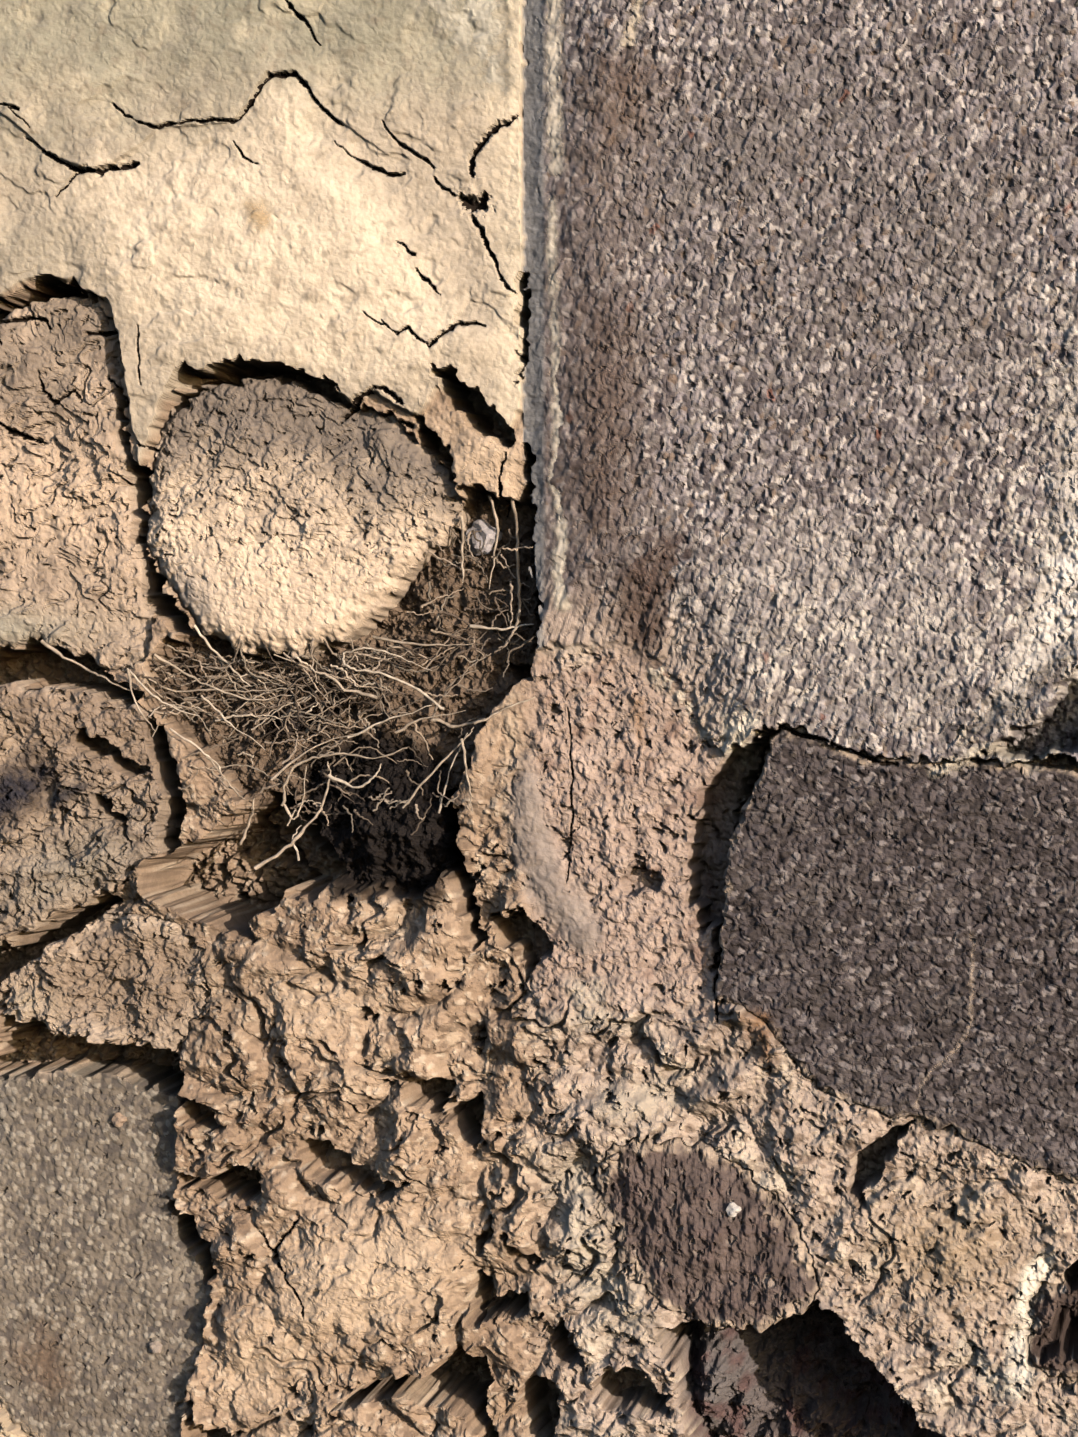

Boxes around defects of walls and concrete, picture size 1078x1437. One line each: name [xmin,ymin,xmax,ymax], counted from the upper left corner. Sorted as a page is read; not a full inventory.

crack [285,0,321,46]
crack [0,103,140,197]
crack [113,71,519,294]
crack [363,242,486,348]
crack [0,316,52,345]
crack [39,291,142,406]
crack [324,377,414,428]
crack [0,422,47,444]
crack [137,442,160,452]
crack [778,724,898,766]
spalling [657,1301,945,1437]